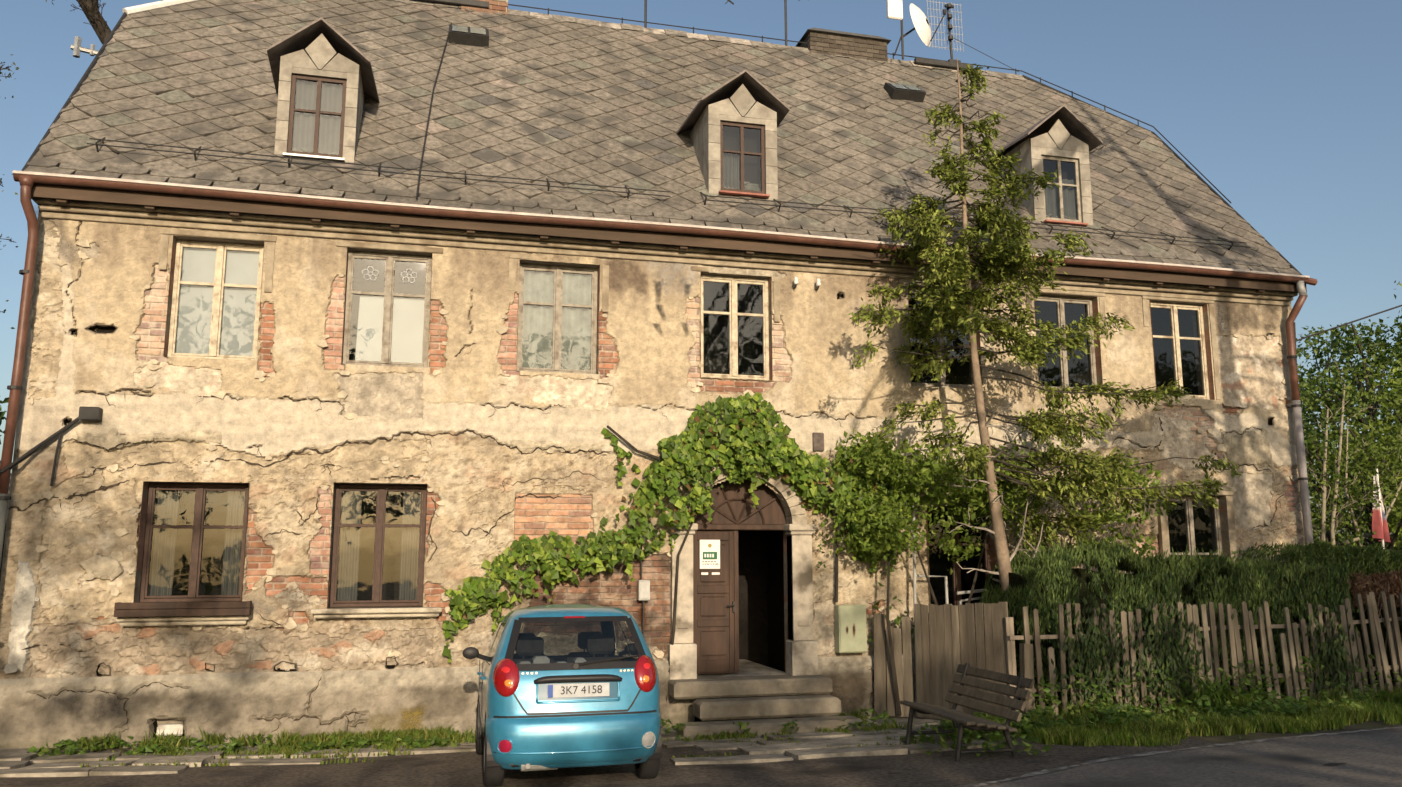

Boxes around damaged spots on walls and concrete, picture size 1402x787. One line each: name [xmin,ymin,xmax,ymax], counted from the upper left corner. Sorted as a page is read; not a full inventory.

crack [77,389,154,406]
flaking render [27,219,226,405]
flaking render [30,418,453,678]
flaking render [255,303,276,382]
crack [7,395,608,562]
flaking render [316,274,449,421]
flaking render [494,293,619,411]
flaking render [523,552,671,659]
flaking render [686,296,792,396]
flaking render [1154,333,1298,531]